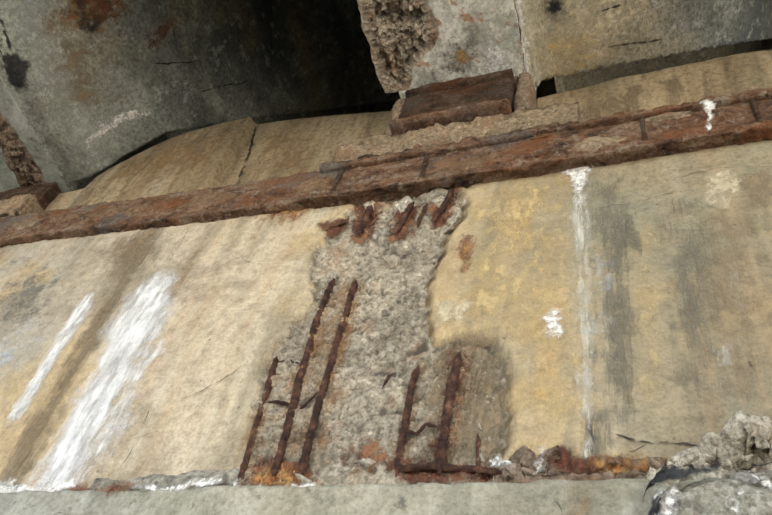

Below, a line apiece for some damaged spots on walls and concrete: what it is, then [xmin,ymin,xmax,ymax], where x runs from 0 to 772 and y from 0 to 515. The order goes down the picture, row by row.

crack [0,19,11,63]
rust [47,0,125,32]
spalling [357,0,439,93]
crack [514,0,525,68]
spalling [0,111,46,187]
crack [238,122,256,177]
rust [318,187,458,243]
damp [565,166,644,272]
damp [0,228,172,493]
spalling [240,187,772,491]
rust [536,446,648,475]